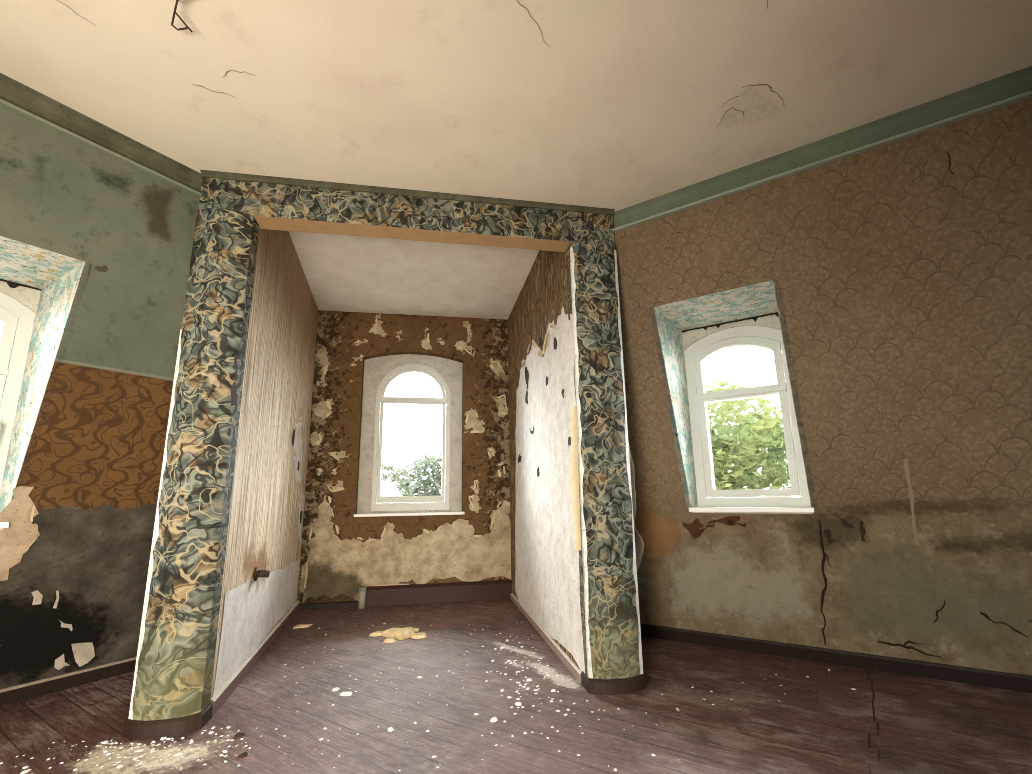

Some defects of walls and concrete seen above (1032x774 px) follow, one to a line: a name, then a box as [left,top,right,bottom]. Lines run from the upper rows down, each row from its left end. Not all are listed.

peeling [0,486,40,581]
flaking render [54,642,95,670]